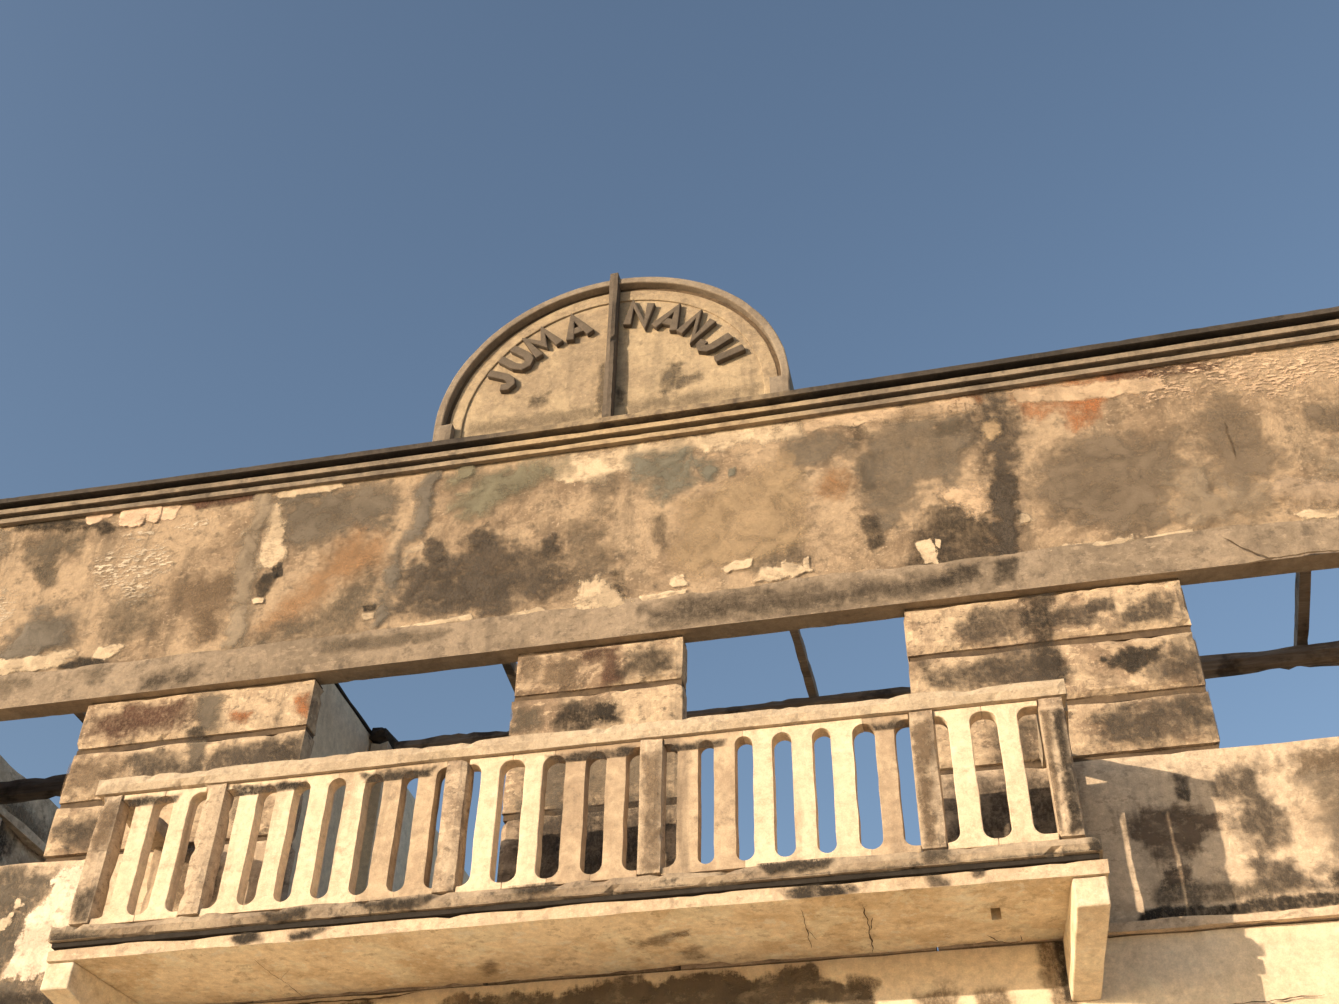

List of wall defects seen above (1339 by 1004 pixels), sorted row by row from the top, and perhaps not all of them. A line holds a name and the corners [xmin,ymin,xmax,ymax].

rust [1063,361,1219,430]
damp [830,382,1022,600]
damp [1035,393,1285,532]
peeling [86,504,208,605]
damp [257,460,619,650]
peeling [721,556,813,582]
spalling [915,538,941,564]
damp [917,593,1175,688]
peeling [0,866,83,982]
damp [0,796,178,1004]
damp [1139,766,1339,921]
damp [1299,750,1339,851]